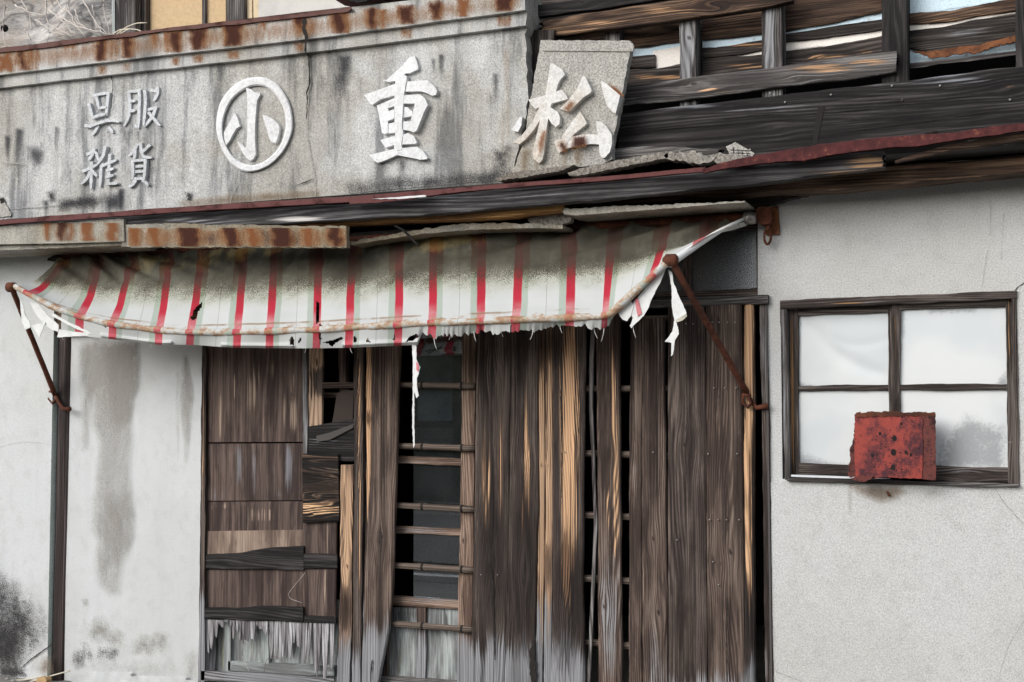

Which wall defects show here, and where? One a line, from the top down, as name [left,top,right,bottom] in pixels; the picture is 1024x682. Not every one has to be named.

rust [0,0,472,74]
rust [913,36,1016,59]
crack [298,17,316,197]
rust [558,136,586,162]
rust [43,223,344,247]
mould [0,576,46,677]